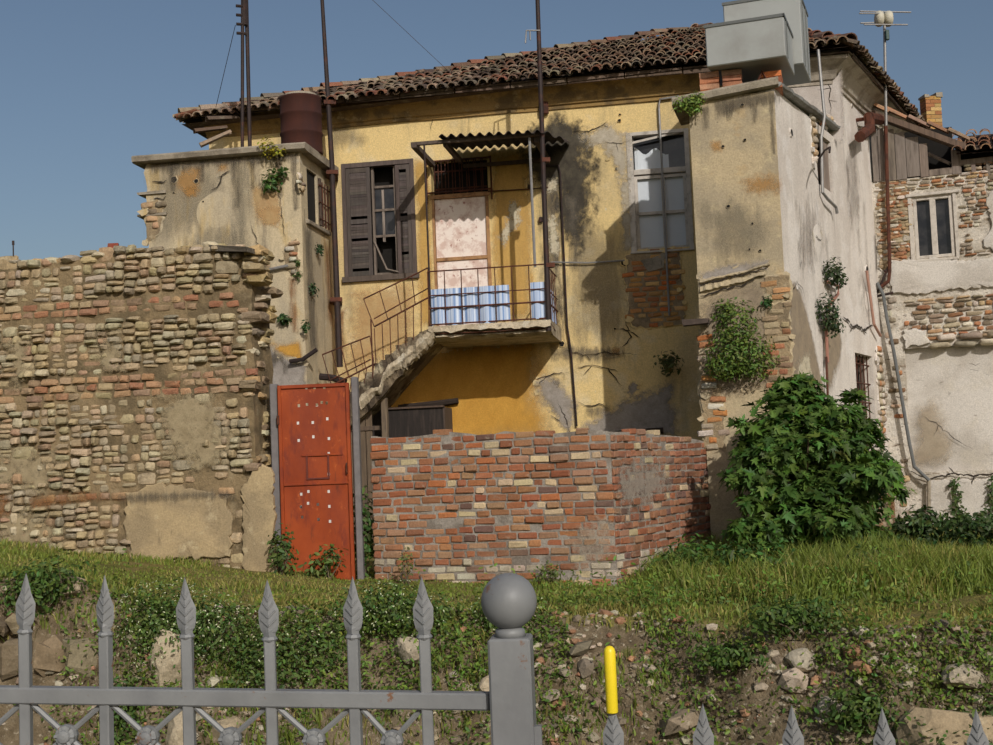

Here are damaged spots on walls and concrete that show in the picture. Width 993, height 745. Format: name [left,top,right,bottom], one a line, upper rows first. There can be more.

spalling [137,175,179,246]
peeling [548,214,561,255]
water stain [520,113,599,316]
spalling [584,113,798,453]
crack [844,317,873,333]
flaking render [865,161,993,482]
crack [536,322,640,388]
flaking render [533,374,579,429]
crack [552,402,609,432]
crack [911,468,993,482]
spalling [867,493,907,529]